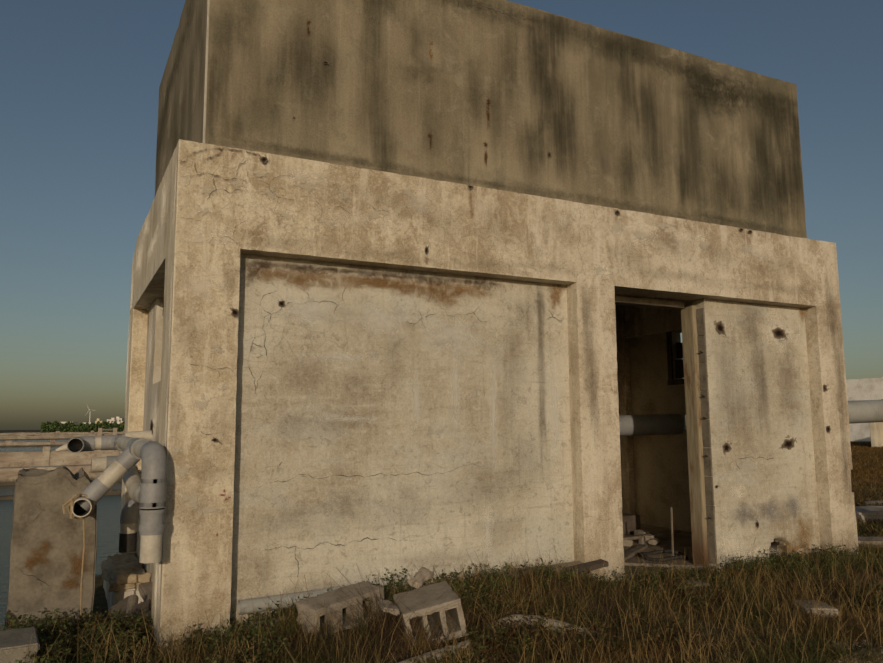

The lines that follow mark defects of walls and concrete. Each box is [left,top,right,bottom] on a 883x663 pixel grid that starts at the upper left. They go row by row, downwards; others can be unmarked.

crack [180,148,262,200]
corrosion [348,271,485,302]
spalling [772,325,789,342]
spalling [779,435,797,450]